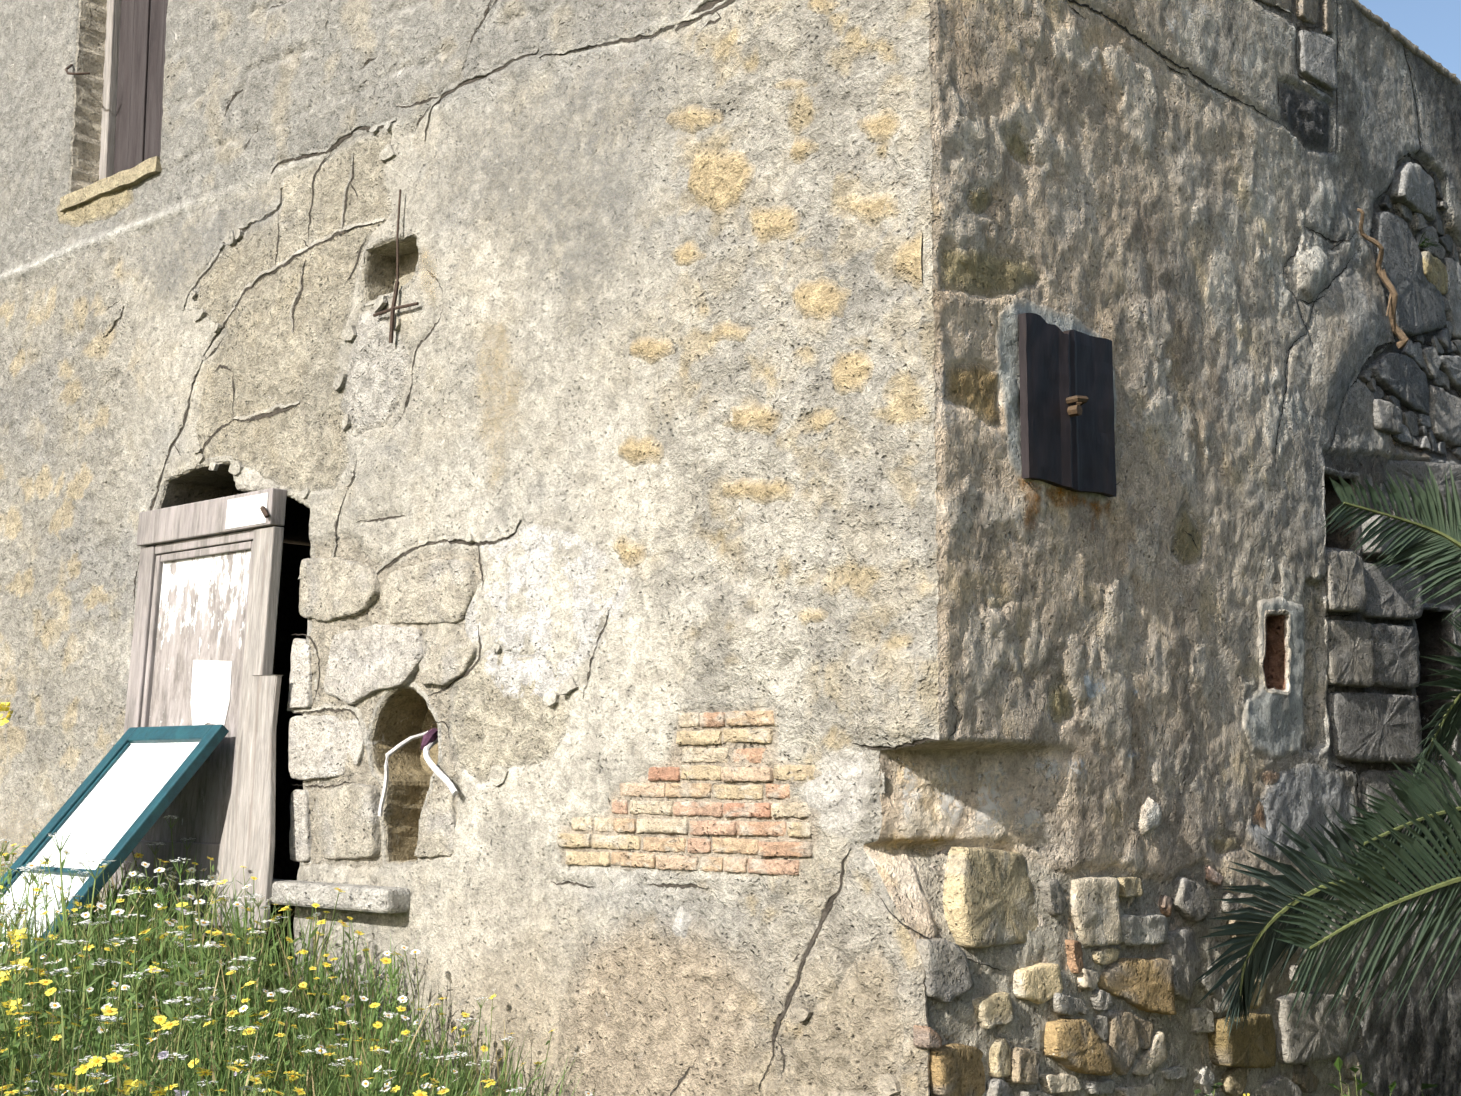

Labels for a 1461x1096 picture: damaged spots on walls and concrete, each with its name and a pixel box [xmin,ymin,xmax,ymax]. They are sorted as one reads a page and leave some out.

crack [1067,0,1339,154]
crack [1378,46,1438,210]
crack [148,0,734,511]
crack [1275,227,1356,465]
crack [1324,338,1461,458]
crack [332,459,521,586]
spalling [450,643,579,786]
flaking render [557,706,822,879]
crack [756,846,930,1096]